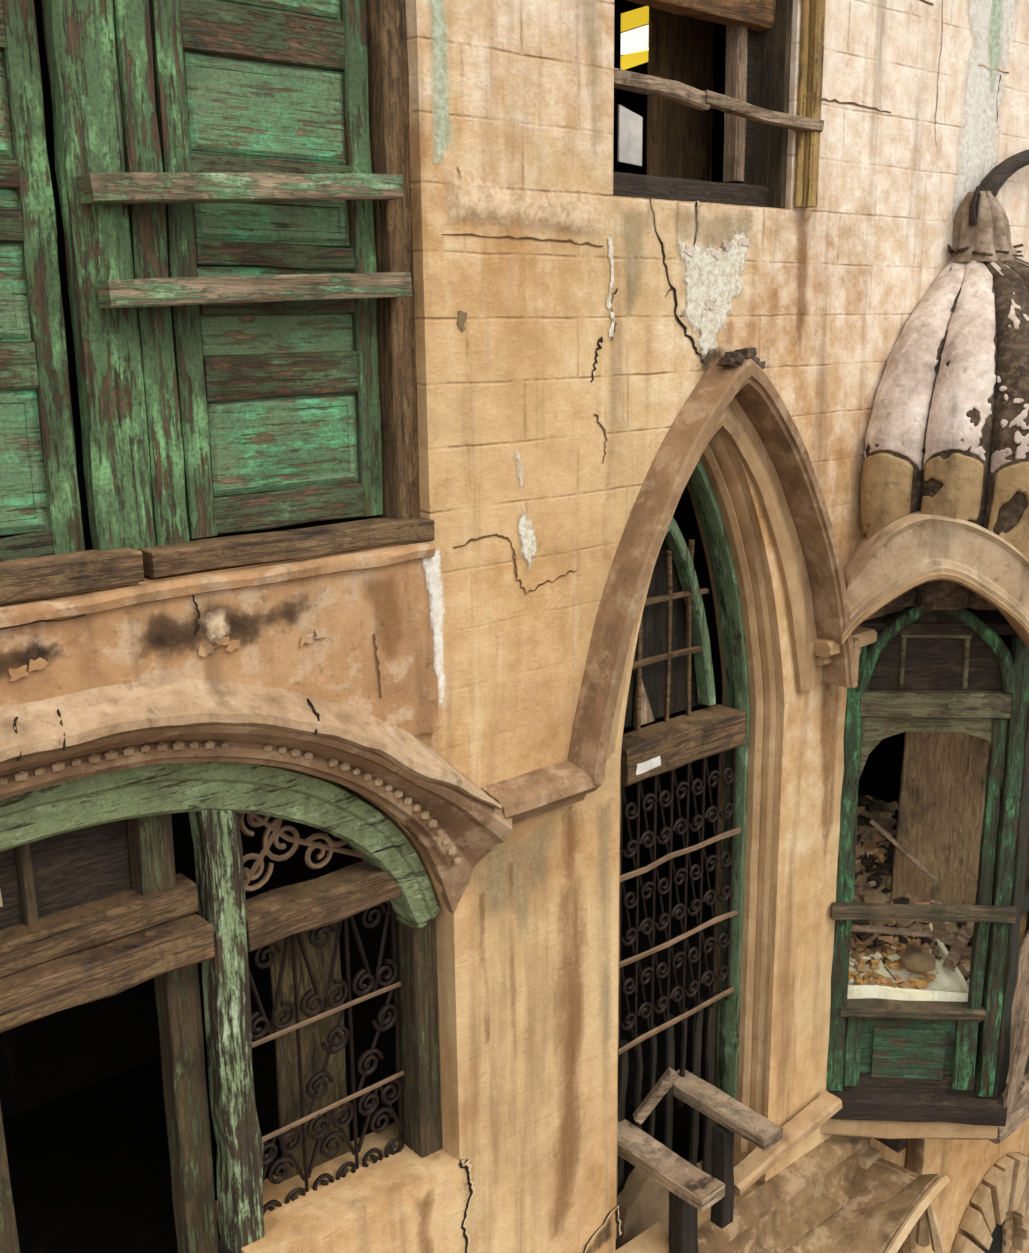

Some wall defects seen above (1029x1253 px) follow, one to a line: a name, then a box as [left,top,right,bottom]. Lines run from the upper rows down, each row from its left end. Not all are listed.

crack [442,233,603,247]
crack [650,199,704,363]
spalling [678,215,766,369]
crack [453,534,577,595]
peeling [518,511,537,566]
leakage [143,600,302,651]
peeling [423,550,445,703]
leakage [0,641,52,676]
crack [459,1159,476,1253]